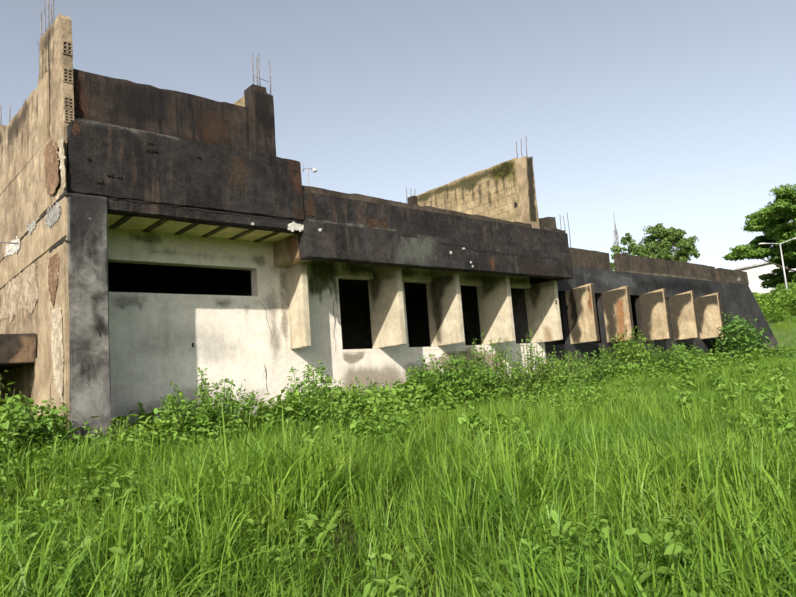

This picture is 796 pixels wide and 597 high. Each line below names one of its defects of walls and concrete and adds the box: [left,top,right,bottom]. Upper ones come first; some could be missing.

spalling [26,136,66,235]
leakage [418,161,515,206]
peeling [0,236,20,258]
spalling [0,264,38,323]
spalling [47,252,64,403]
leakage [75,378,107,416]
leakage [343,350,503,397]